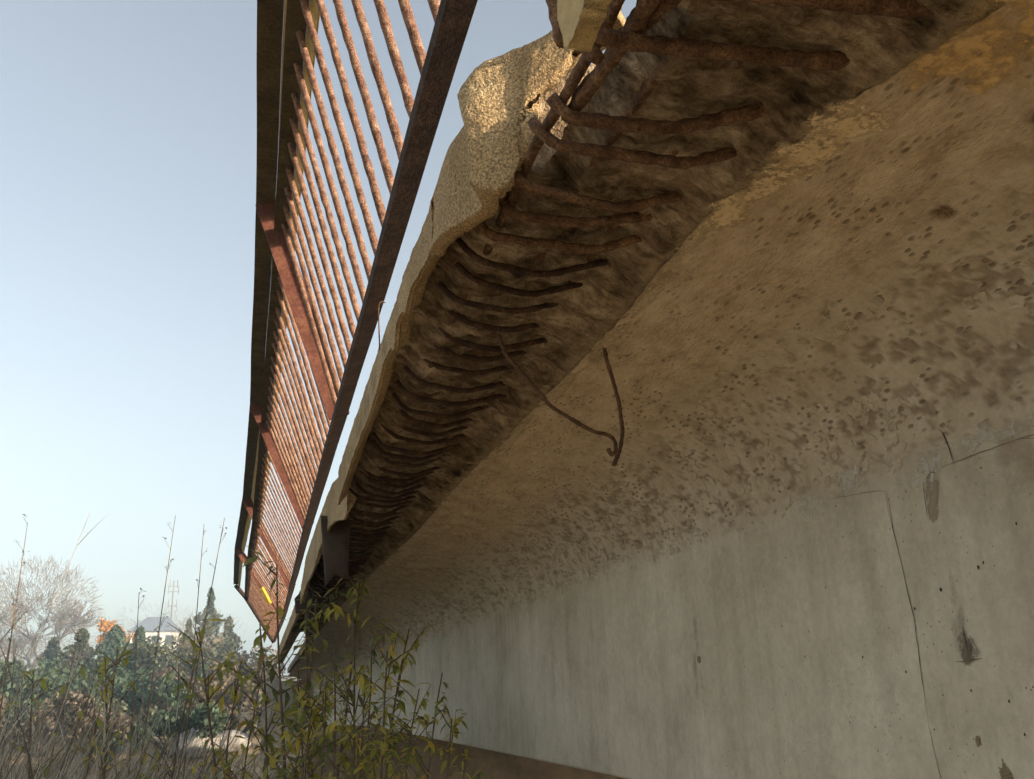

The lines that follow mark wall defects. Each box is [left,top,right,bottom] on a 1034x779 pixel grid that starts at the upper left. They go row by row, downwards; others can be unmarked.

rust [908,0,1034,94]
spalling [289,0,1008,634]
crack [939,432,1034,468]
crack [833,491,941,777]
leakage [958,627,982,665]